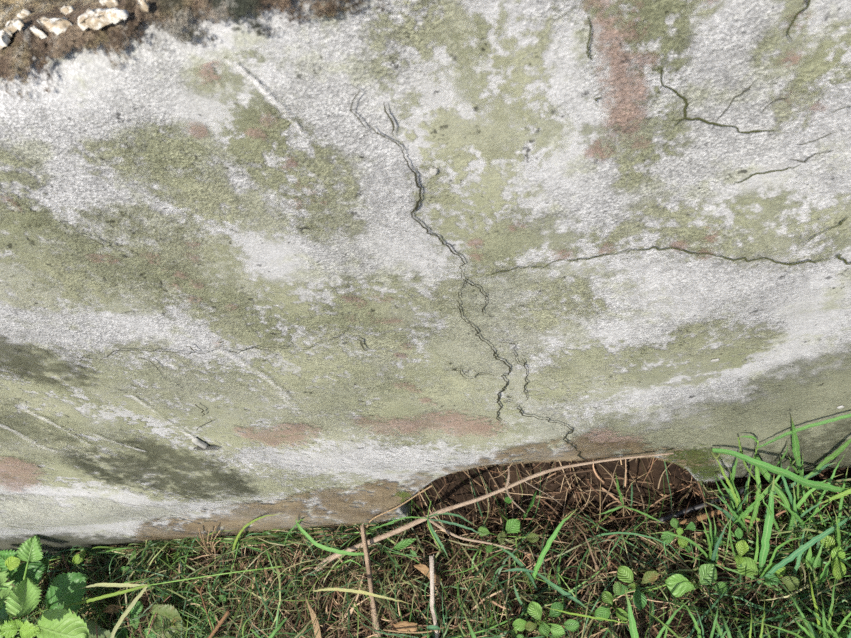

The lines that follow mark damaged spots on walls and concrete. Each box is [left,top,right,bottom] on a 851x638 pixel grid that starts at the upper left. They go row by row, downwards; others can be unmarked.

crack [585,14,593,59]
crack [787,0,811,40]
crack [653,66,788,134]
crack [350,85,851,462]
leakage [0,337,94,386]
leakage [0,413,74,442]
leakage [587,345,851,478]
leakage [72,441,255,499]